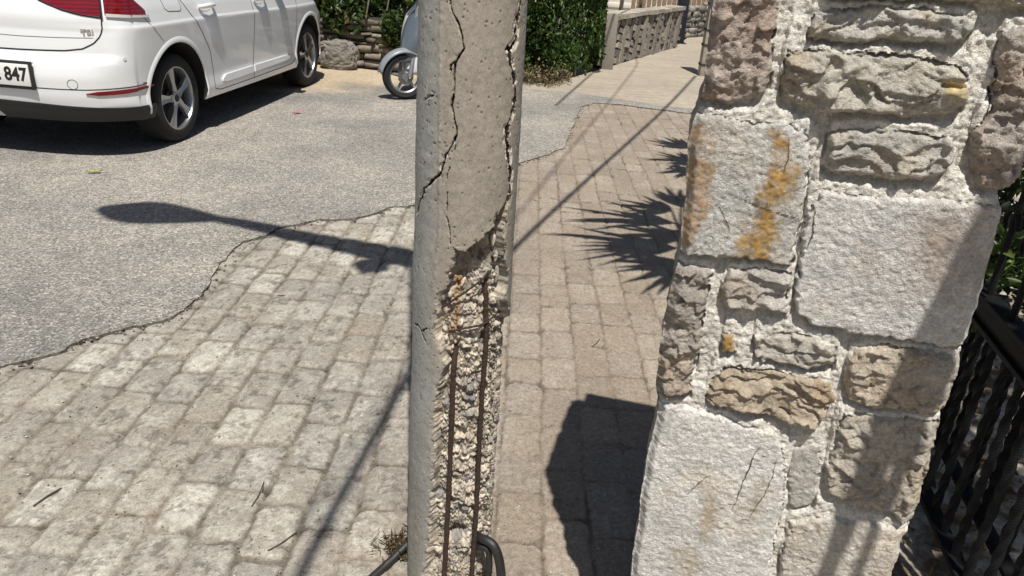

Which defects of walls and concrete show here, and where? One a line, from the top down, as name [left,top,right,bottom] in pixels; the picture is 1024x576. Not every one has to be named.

corrosion [771,131,789,149]
corrosion [681,158,715,244]
corrosion [737,165,800,260]
crack [734,446,777,519]